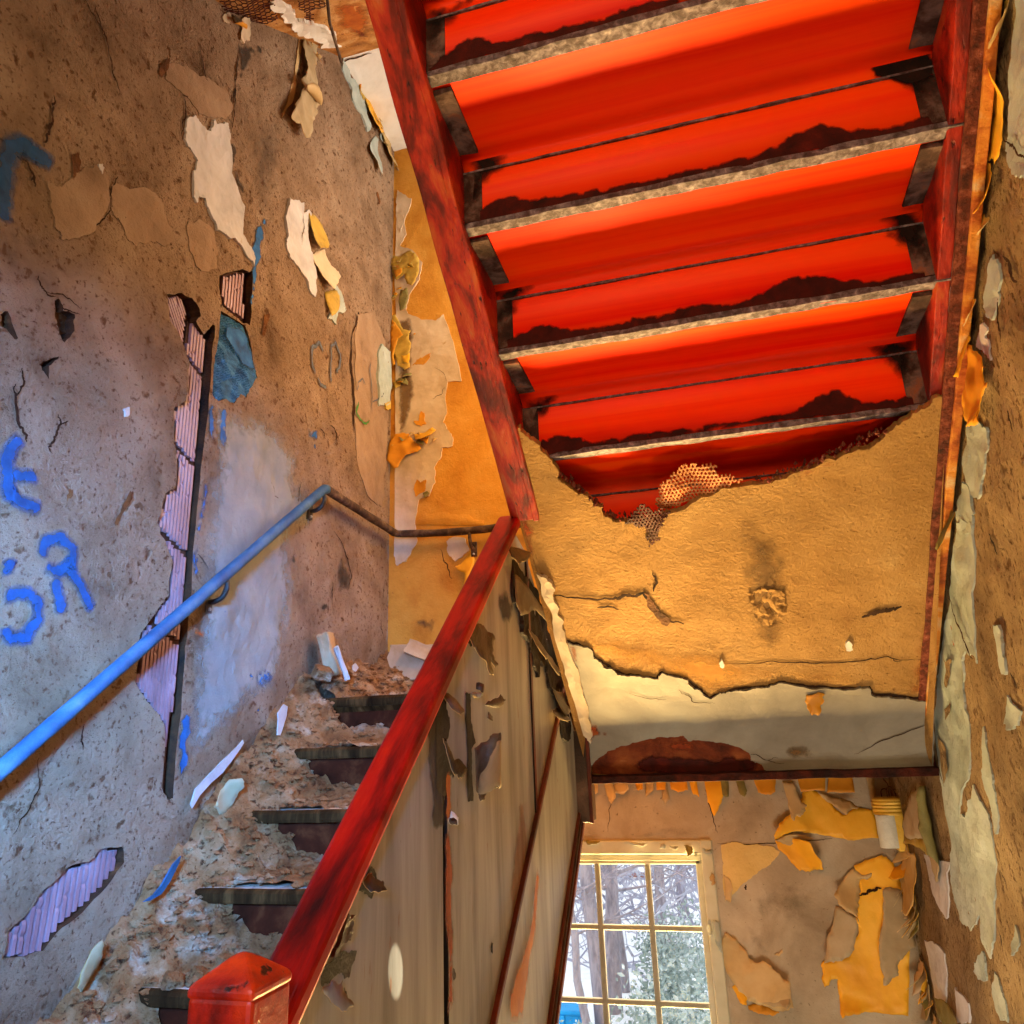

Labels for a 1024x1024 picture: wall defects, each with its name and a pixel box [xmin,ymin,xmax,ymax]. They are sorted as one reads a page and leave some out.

crack [13,369,68,453]
flaking render [139,115,257,640]
peeling [376,190,462,566]
flaking render [136,623,181,793]
peeling [447,537,474,584]
peeling [435,623,505,825]
crack [555,573,684,624]
peeling [509,254,1009,1024]
crack [724,656,920,664]
peeling [1004,695,1023,731]
flaking render [4,848,117,957]
peeling [1011,925,1021,956]